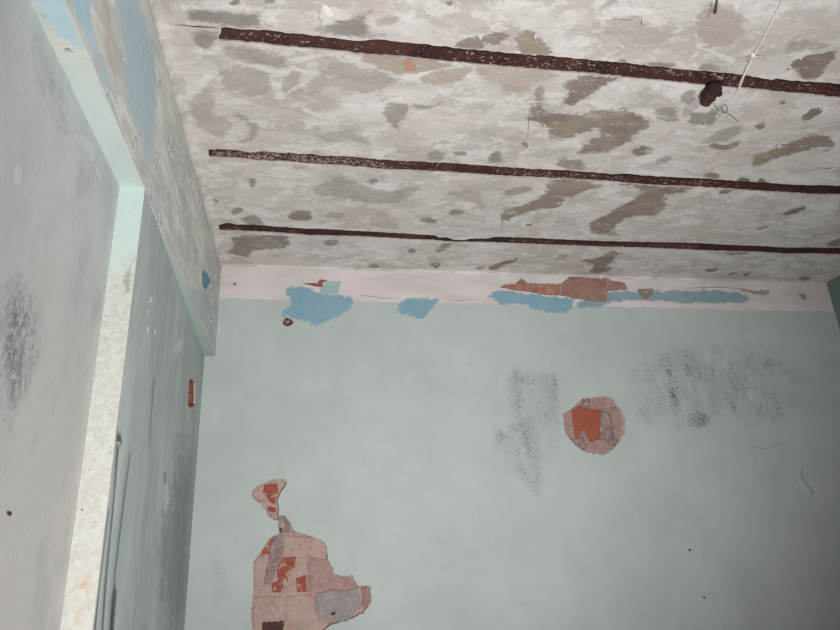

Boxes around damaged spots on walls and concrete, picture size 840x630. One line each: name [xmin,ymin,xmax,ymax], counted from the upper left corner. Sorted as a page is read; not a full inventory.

rust [288,163,313,171]
peeling [278,279,356,328]
peeling [394,295,441,322]
peeling [483,249,772,316]
flaking render [188,377,196,414]
water stain [623,334,806,437]
water stain [486,360,566,514]
flaking render [563,396,625,455]
flaking render [251,478,371,630]